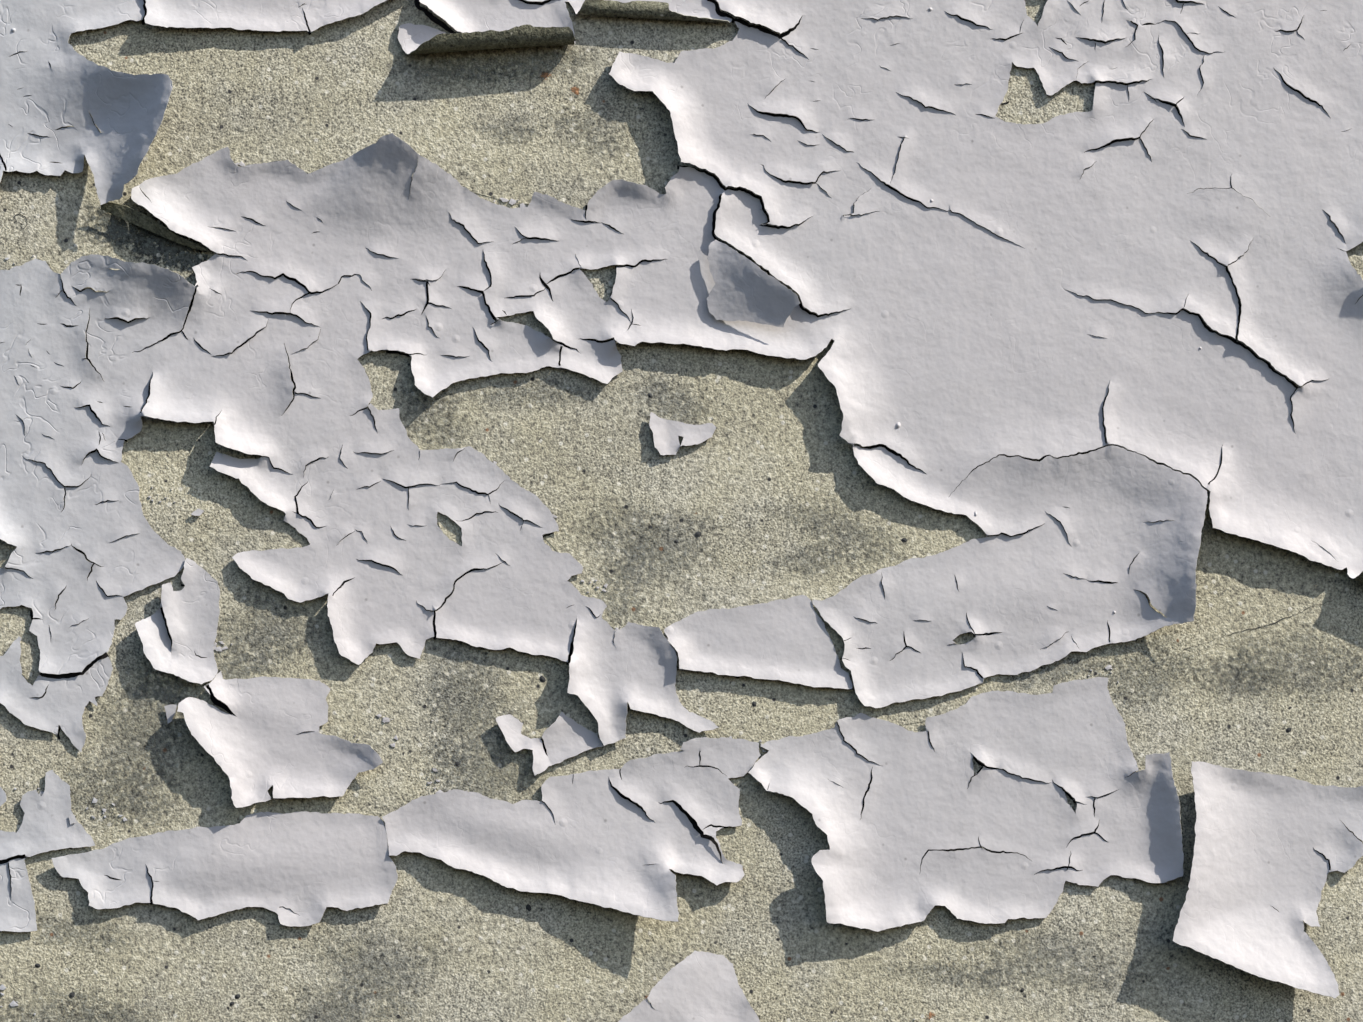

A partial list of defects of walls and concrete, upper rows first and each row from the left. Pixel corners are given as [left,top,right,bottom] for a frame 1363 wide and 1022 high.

crack [677,0,1025,318]
crack [946,0,1234,179]
crack [1,205,664,511]
crack [268,407,553,640]
peeling [0,0,987,640]
crack [950,385,1223,495]
crack [1067,242,1328,432]
peeling [1342,242,1363,312]
crack [32,652,109,699]
crack [160,584,237,717]
peeling [0,403,1363,1022]
crack [920,754,1135,875]